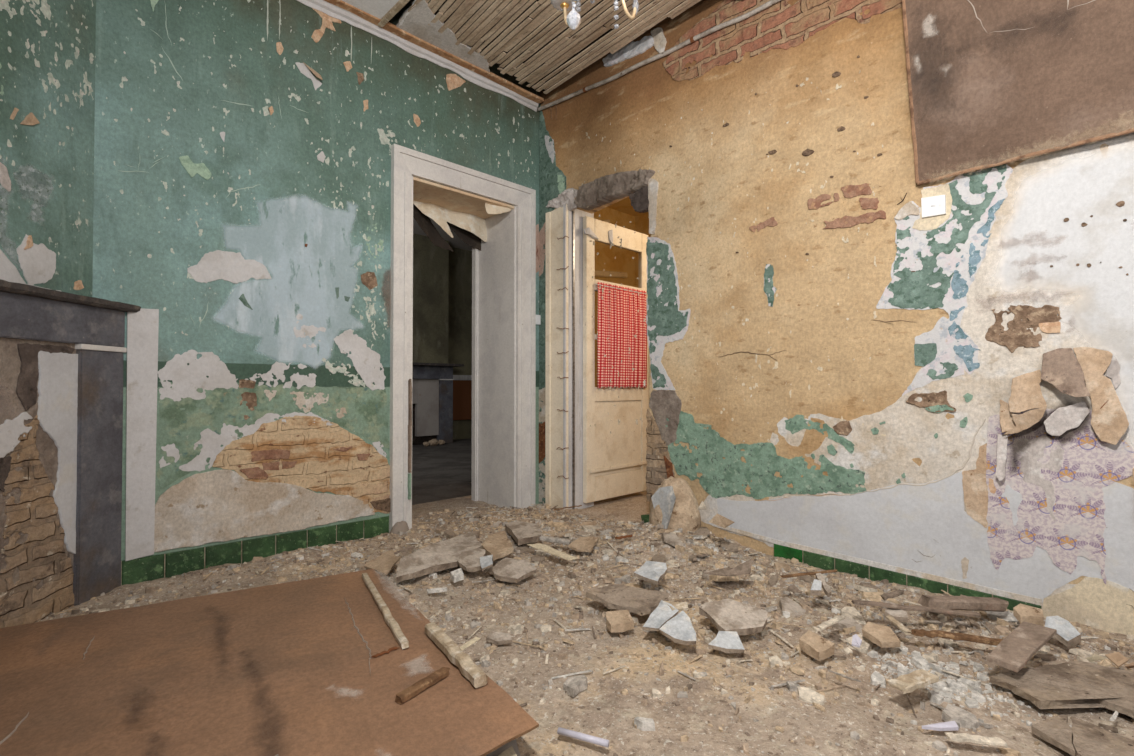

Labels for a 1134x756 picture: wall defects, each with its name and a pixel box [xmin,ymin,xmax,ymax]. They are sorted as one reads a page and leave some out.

flaking render [663,0,902,81]
spalling [796,55,861,100]
crack [968,0,1033,33]
spalling [789,148,820,173]
flaking render [147,8,567,514]
flaking render [708,207,778,257]
peeling [755,264,778,307]
peeling [583,221,709,434]
peeling [806,164,1129,525]
flaking render [0,415,74,628]
peeling [635,382,886,587]
spalling [779,583,900,634]